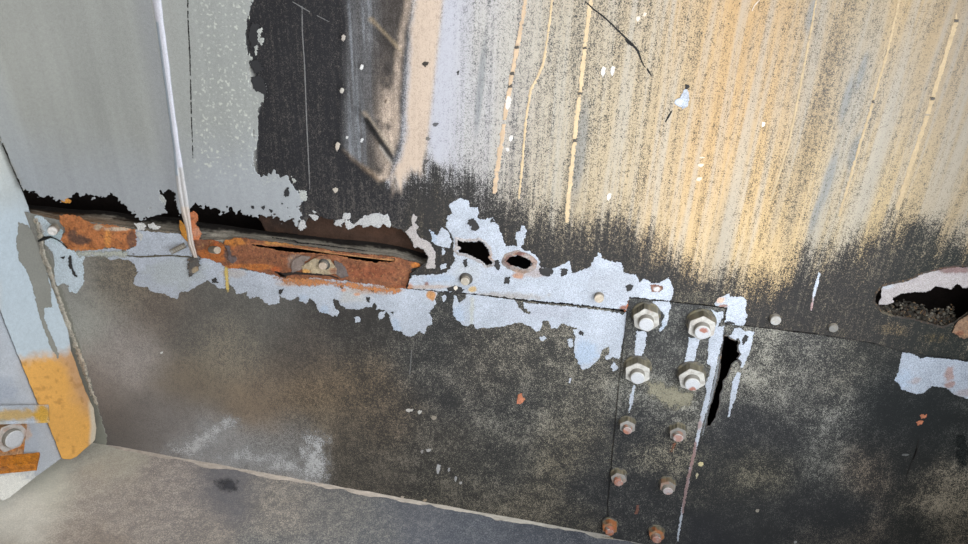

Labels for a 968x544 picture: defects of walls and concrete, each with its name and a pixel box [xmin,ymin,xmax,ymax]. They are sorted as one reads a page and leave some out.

rust [59,198,137,259]
rust [179,211,420,294]
peeling [0,0,691,371]
water stain [492,0,527,194]
water stain [518,0,553,199]
water stain [565,0,593,223]
peeling [677,294,816,541]
water stain [770,0,817,200]
water stain [838,0,901,217]
peeling [862,341,968,399]
spalling [875,284,968,323]
water stain [896,13,959,210]